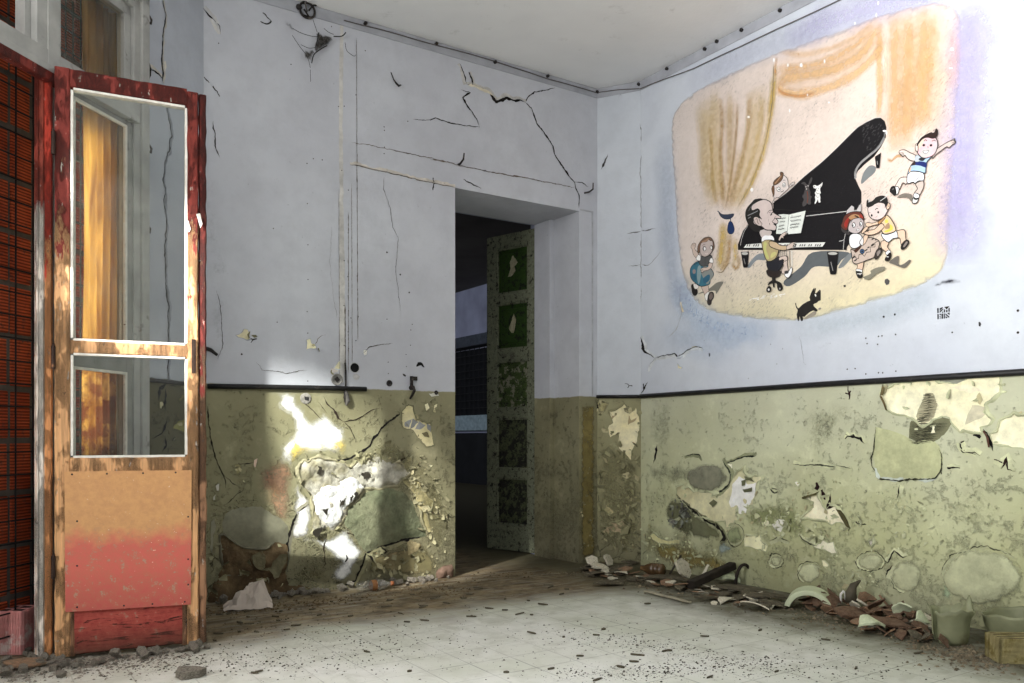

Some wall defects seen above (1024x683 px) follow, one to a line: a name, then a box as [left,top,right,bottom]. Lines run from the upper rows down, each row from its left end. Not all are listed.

crack [150,0,167,83]
crack [350,63,608,303]
crack [625,290,703,393]
crack [207,410,253,508]
crack [286,397,400,555]
spalling [290,393,454,580]
peeling [581,398,1014,589]
peeling [879,370,1024,449]
crack [323,532,421,588]